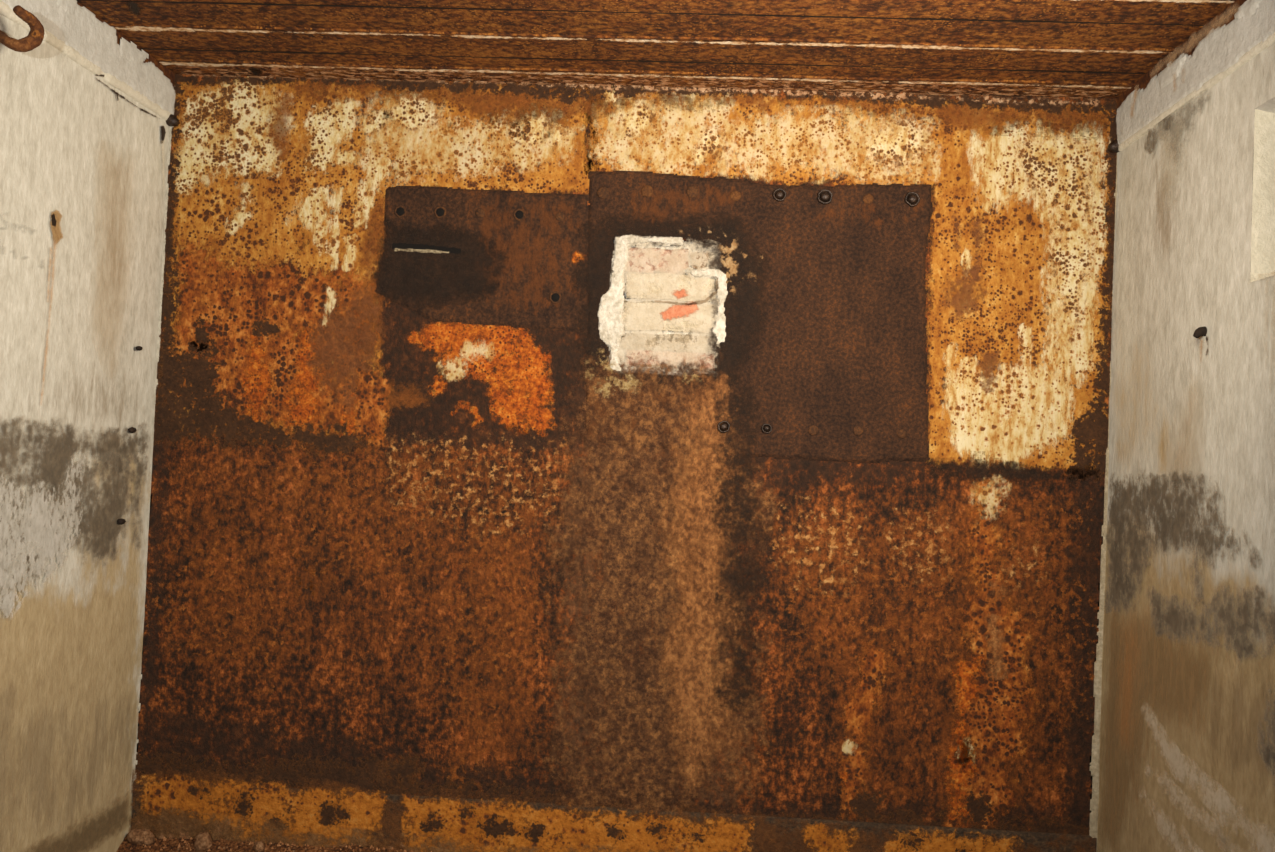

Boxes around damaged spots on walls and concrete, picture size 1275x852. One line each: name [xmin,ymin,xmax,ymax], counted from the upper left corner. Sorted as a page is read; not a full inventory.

leakage [0,418,148,593]
rust [427,505,549,819]
flaking render [661,289,698,320]
rust [116,0,1247,692]
rust [539,213,1099,852]
leakage [1102,471,1275,852]